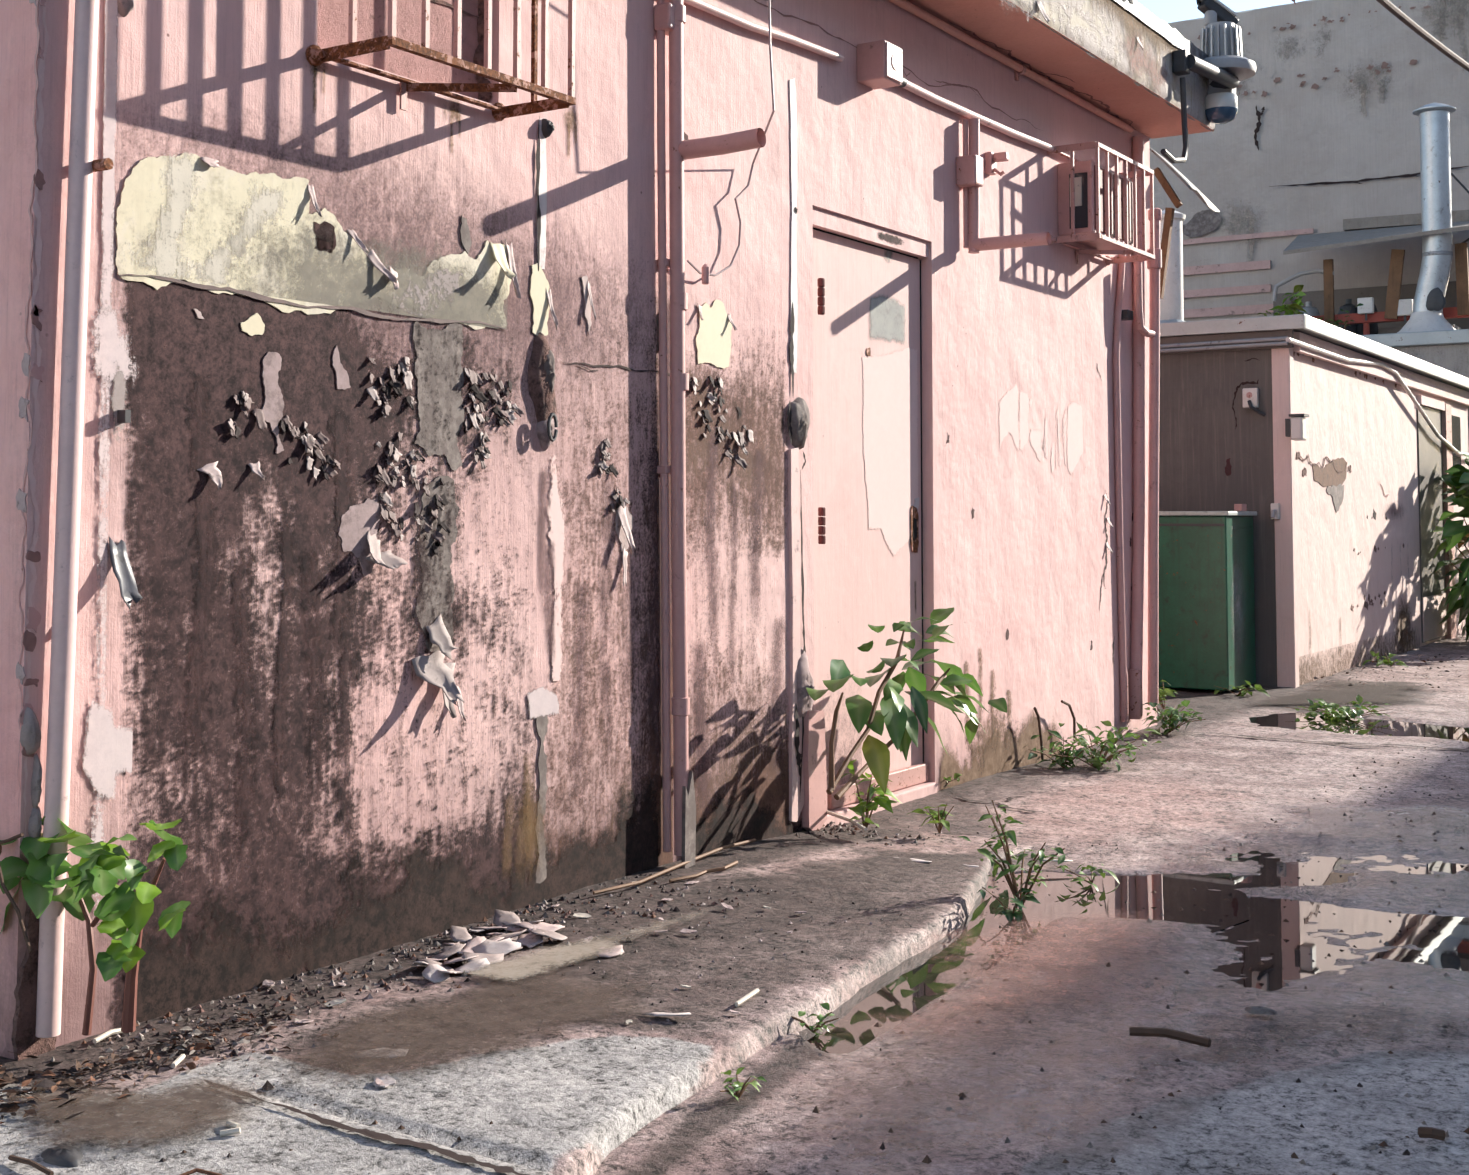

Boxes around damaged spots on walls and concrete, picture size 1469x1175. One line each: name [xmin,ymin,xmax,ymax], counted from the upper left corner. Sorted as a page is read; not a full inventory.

rust [313,63,325,106]
peeling [115,152,559,721]
peeling [692,300,754,470]
spalling [1296,452,1351,513]
damp [82,281,805,1029]